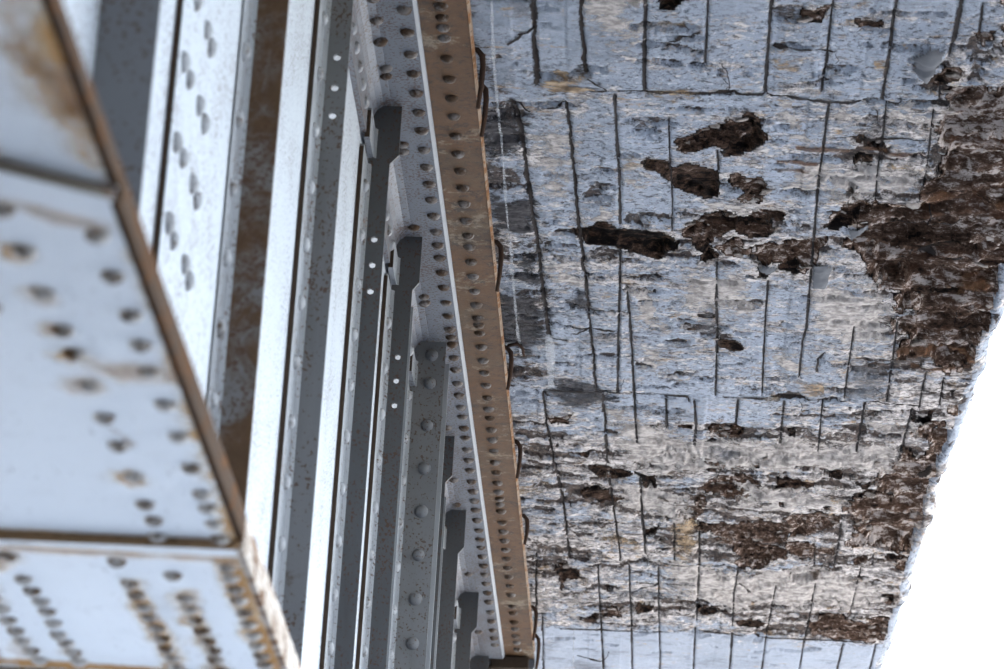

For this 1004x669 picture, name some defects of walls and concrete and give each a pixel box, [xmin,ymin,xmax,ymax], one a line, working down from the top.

corrosion [3,0,103,168]
peeling [560,0,685,53]
crack [772,43,839,65]
spalling [796,3,832,23]
spalling [572,49,1004,376]
crack [507,0,765,599]
crack [722,394,921,418]
peeling [579,389,960,644]
corrosion [0,589,180,669]
corrosion [214,557,281,669]
spalling [530,562,622,634]
crack [531,553,874,669]